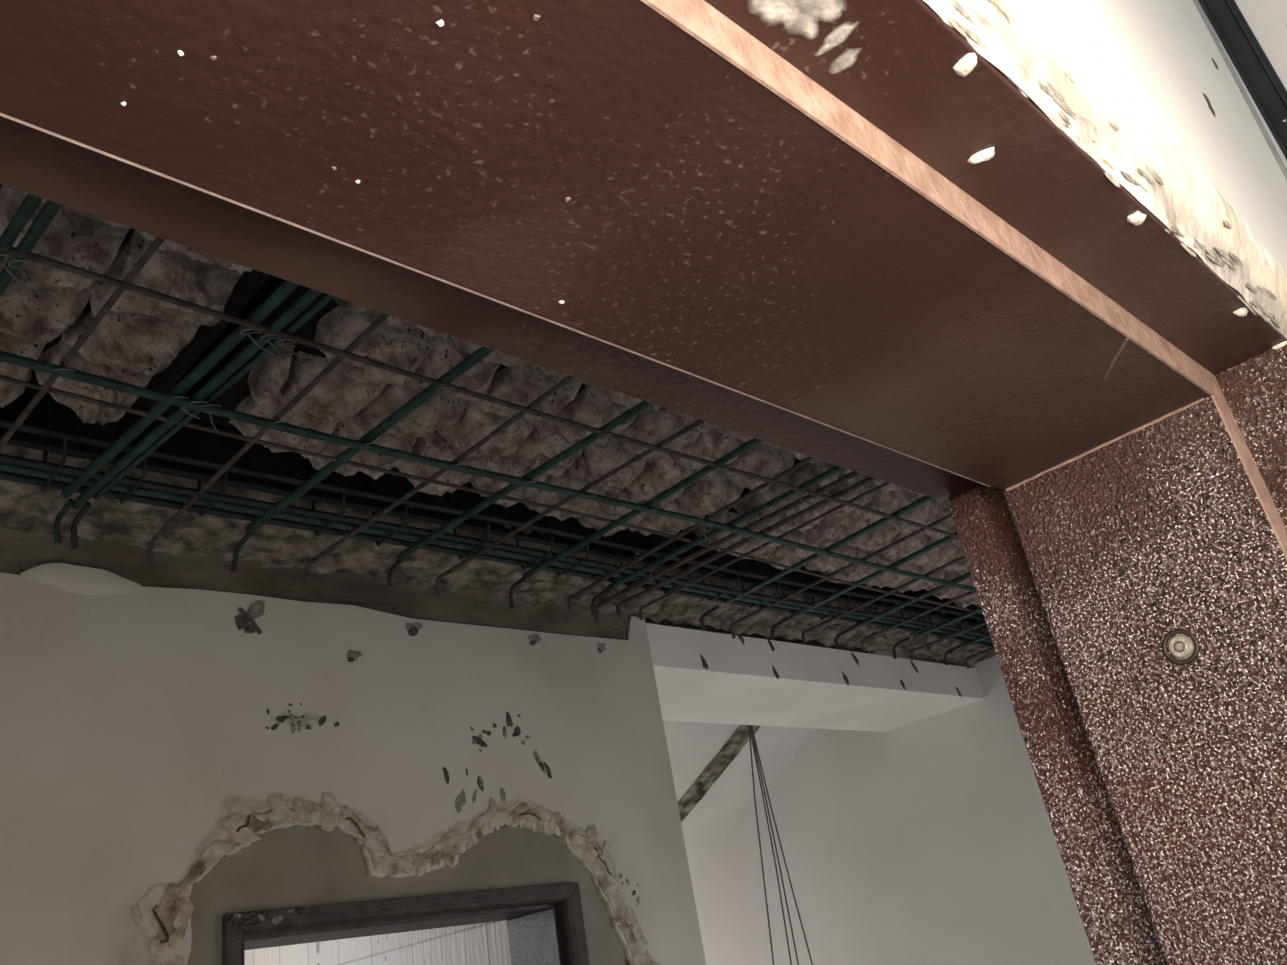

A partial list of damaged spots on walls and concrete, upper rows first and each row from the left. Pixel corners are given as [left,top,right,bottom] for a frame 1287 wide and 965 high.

peeling [0,185,996,669]
peeling [266,703,339,734]
peeling [470,712,552,779]
spalling [678,725,760,823]
spalling [132,767,662,965]